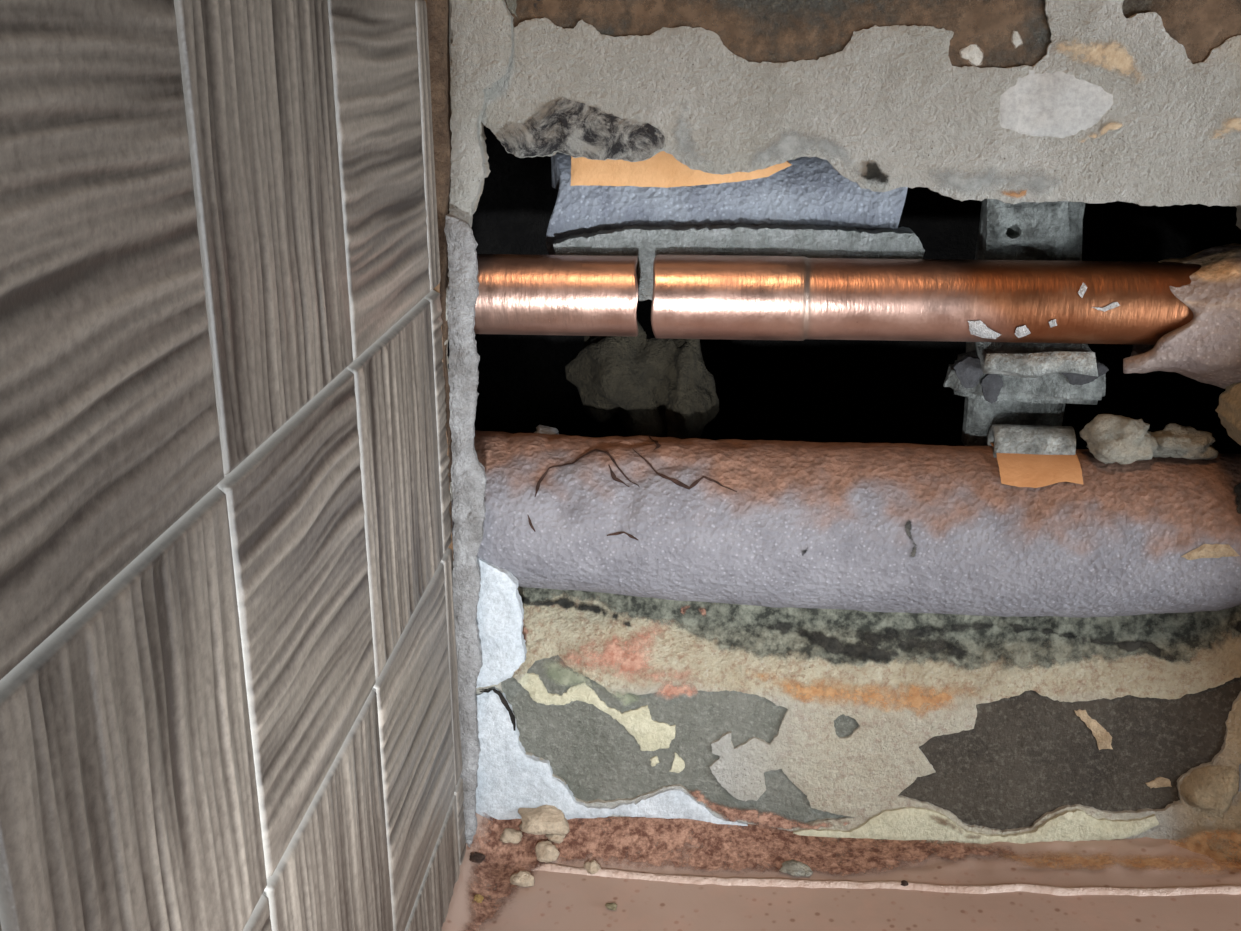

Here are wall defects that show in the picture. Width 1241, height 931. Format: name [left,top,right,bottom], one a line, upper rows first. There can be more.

spalling [505,0,531,27]
spalling [549,0,698,37]
spalling [686,0,995,63]
spalling [949,0,1051,68]
damp [1058,43,1134,75]
spalling [1122,0,1196,64]
spalling [497,97,665,162]
damp [520,587,1241,670]
spalling [476,655,1241,844]